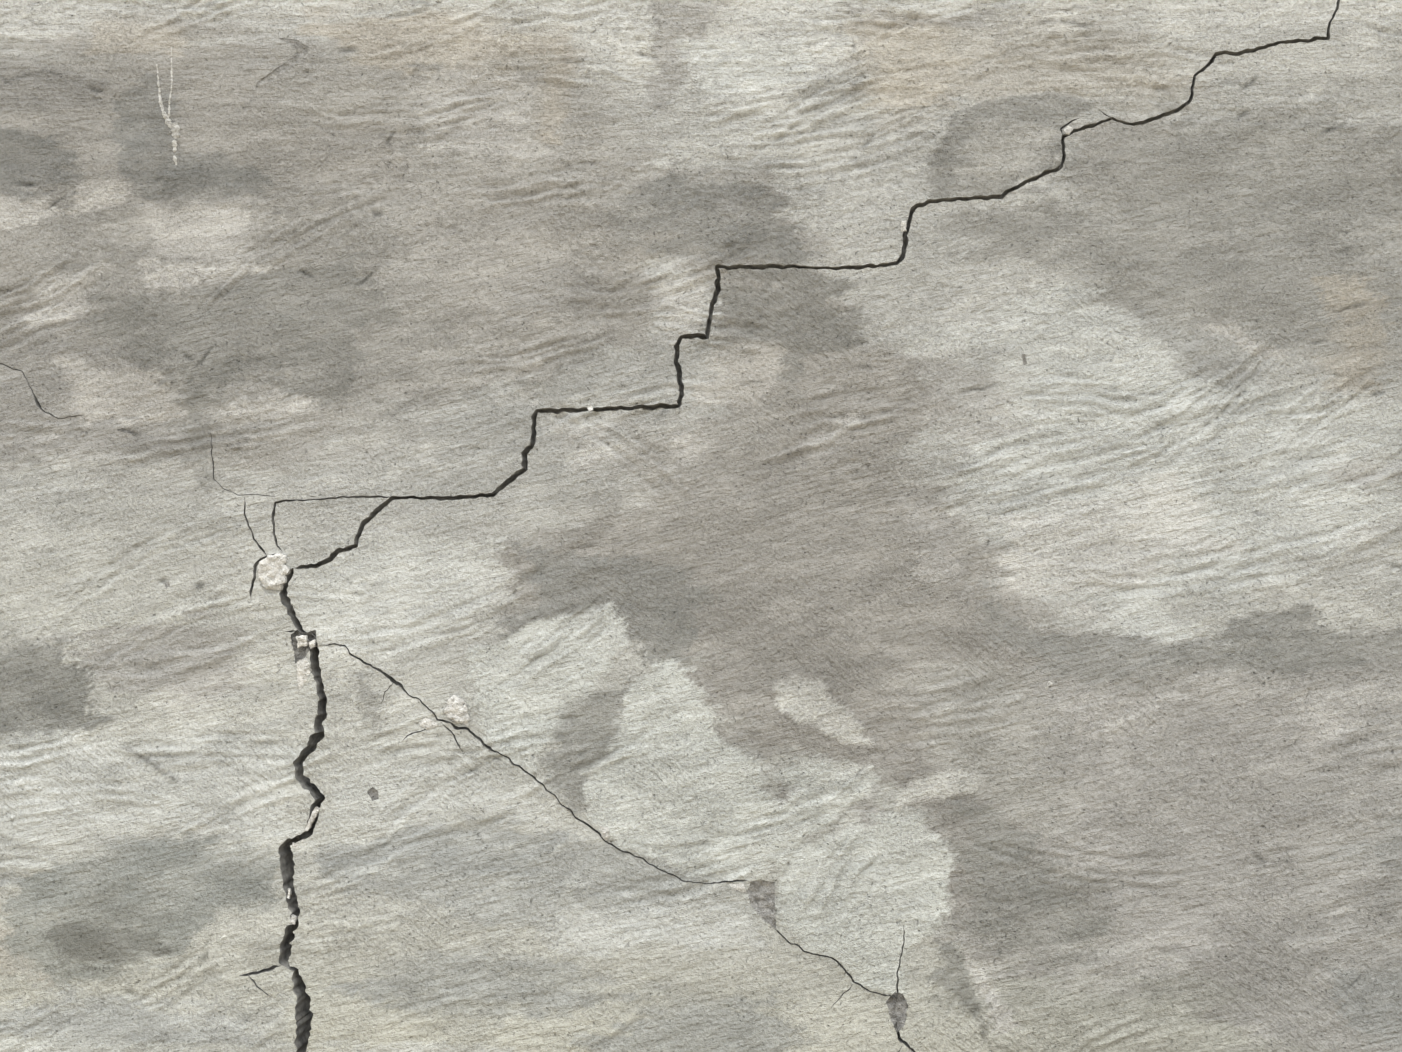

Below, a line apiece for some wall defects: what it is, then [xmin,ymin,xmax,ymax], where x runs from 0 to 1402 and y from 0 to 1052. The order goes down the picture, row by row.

leakage [0,621,117,749]
leakage [0,47,281,211]
crack [210,429,275,497]
leakage [75,246,419,491]
leakage [474,529,725,821]
leakage [589,147,881,409]
crack [240,0,1340,1052]
leakage [885,87,1402,395]
leakage [952,575,1402,695]
leakage [924,795,1138,1051]